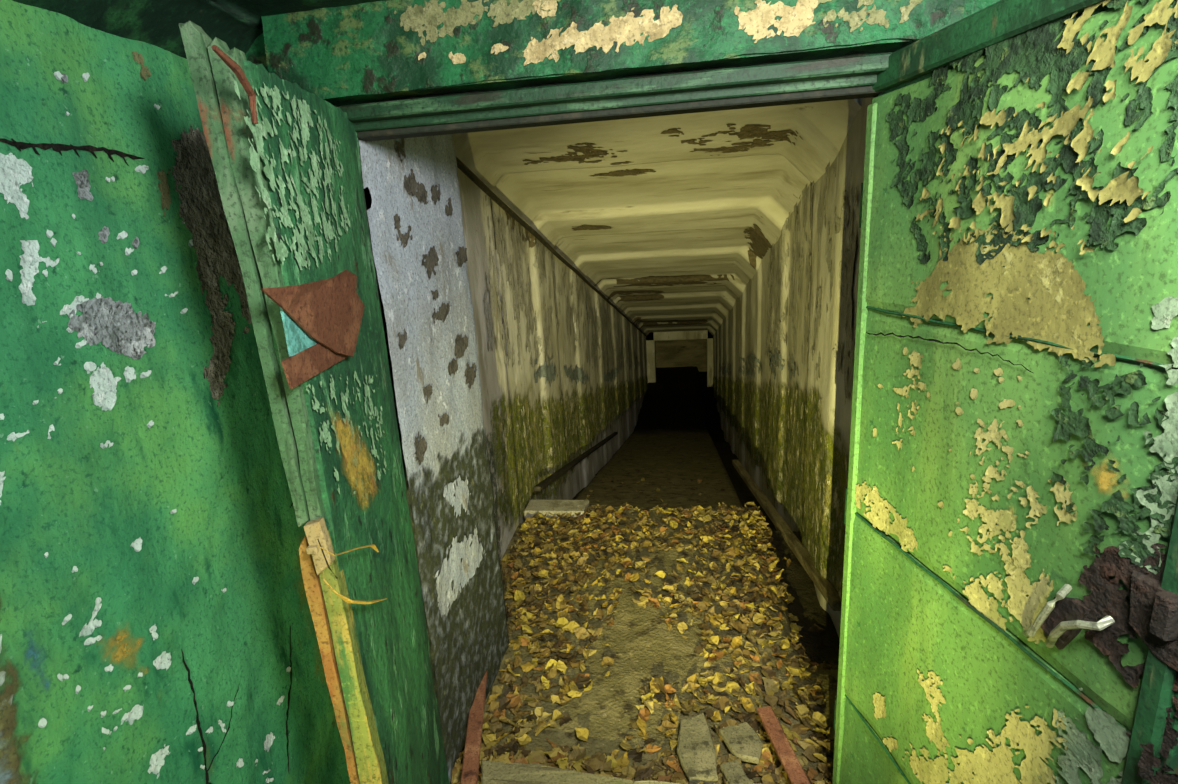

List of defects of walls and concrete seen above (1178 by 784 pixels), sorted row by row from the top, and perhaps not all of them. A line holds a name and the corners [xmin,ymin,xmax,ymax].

peeling [394,0,683,66]
peeling [734,0,922,43]
crack [0,138,145,166]
peeling [5,229,59,306]
flaking render [60,293,156,411]
flaking render [135,124,253,407]
peeling [886,0,1178,644]
peeling [435,475,486,617]
peeling [855,482,918,552]
corrosion [1078,543,1167,688]
peeling [883,669,1131,784]
corrosion [1126,671,1178,784]